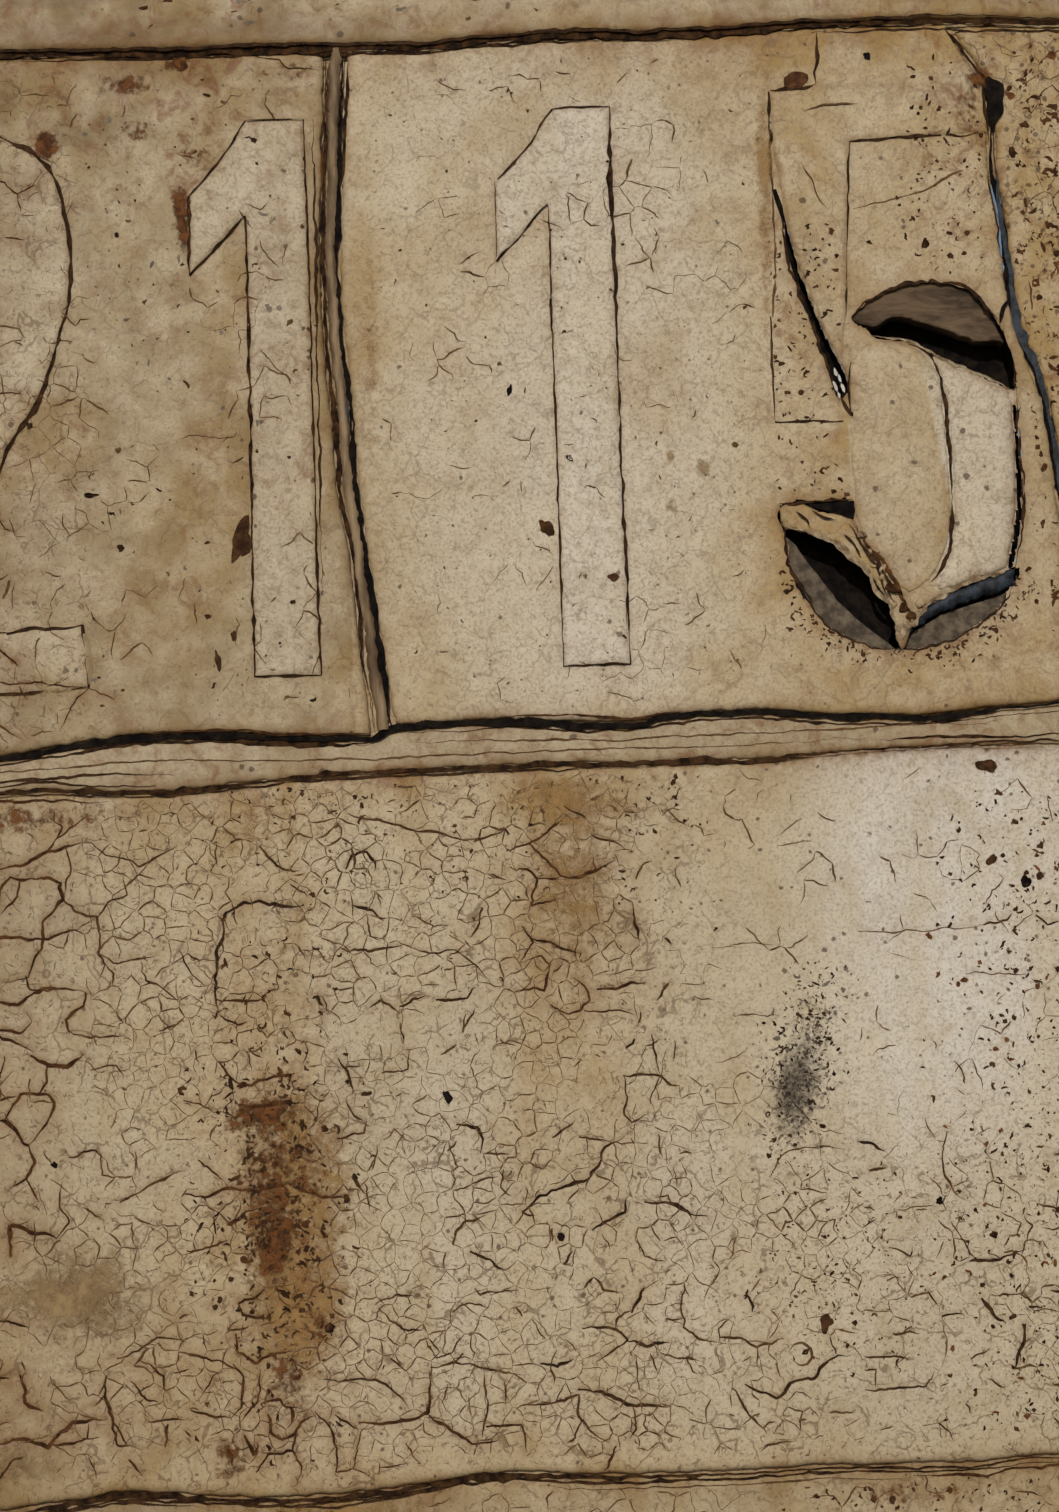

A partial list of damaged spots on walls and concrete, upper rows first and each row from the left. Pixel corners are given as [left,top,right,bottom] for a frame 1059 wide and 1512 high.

peeling [784,71,809,89]
crack [0,267,109,507]
crack [182,202,295,441]
crack [392,327,631,590]
crack [541,119,754,344]
peeling [857,531,921,639]
crack [858,833,1058,960]
corrosion [226,1097,327,1338]
crack [893,1110,1059,1399]
corrosion [217,1427,246,1478]
corrosion [269,1356,307,1399]
crack [864,1369,949,1392]